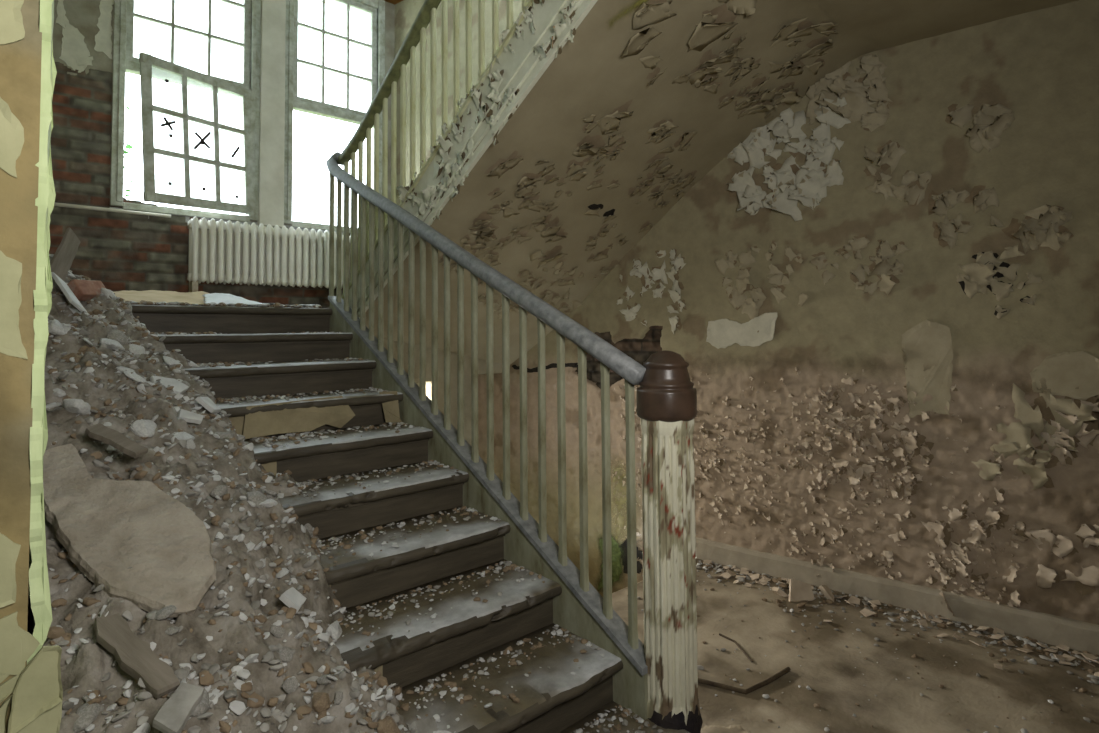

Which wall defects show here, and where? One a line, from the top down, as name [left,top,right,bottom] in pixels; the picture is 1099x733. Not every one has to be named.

peeling [397,0,585,225]
peeling [0,0,343,733]
peeling [460,99,697,365]
flaking render [575,353,643,574]
peeling [706,234,911,349]
peeling [694,320,1099,616]
peeling [863,140,1074,319]